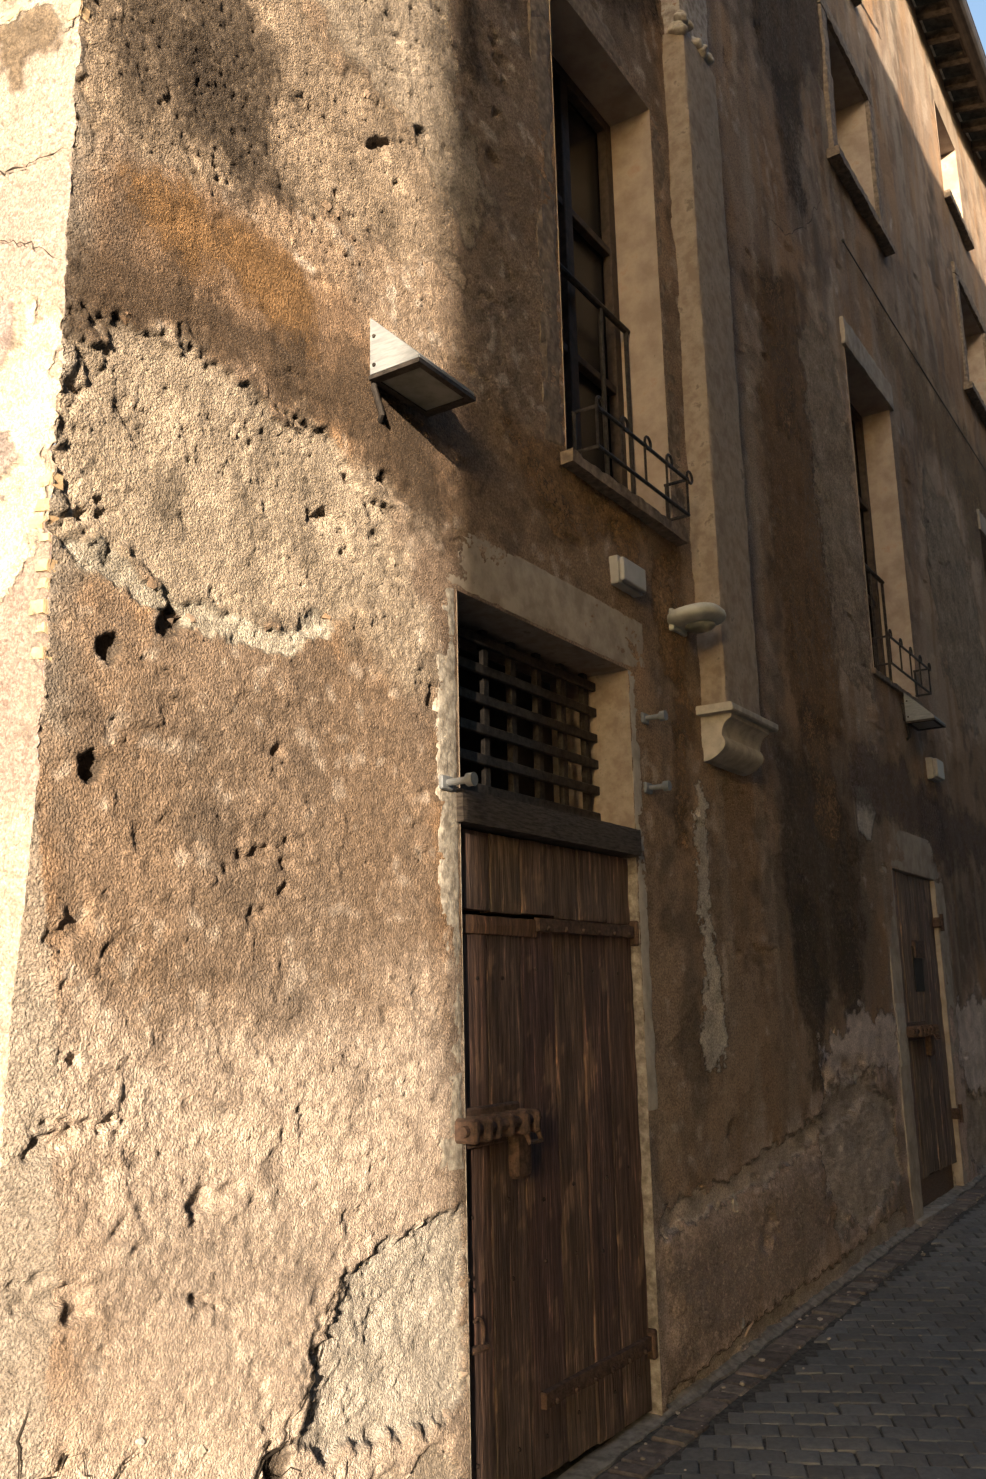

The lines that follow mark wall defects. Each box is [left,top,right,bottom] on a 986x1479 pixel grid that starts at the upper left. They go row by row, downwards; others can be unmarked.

crack [0,239,60,260]
water stain [0,3,63,90]
crack [0,148,67,176]
spalling [0,298,391,737]
spalling [0,0,502,291]
water stain [64,242,444,540]